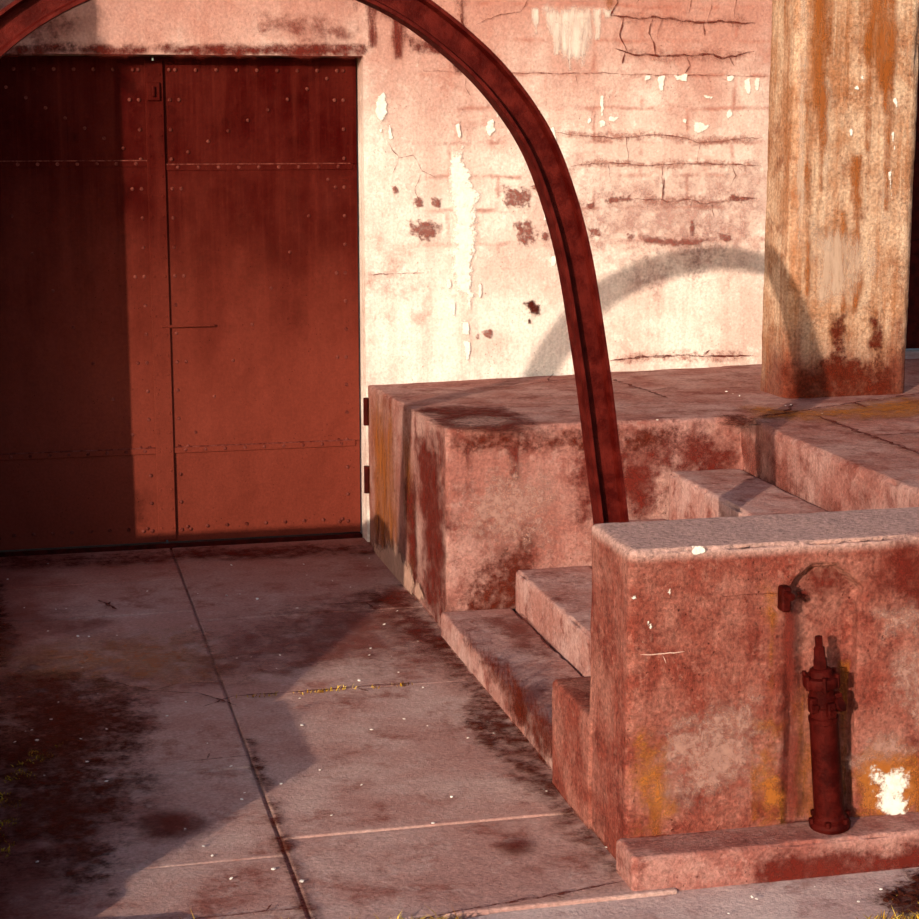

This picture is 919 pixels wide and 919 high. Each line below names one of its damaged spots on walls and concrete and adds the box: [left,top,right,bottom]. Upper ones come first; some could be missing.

leakage [388,16,439,58]
crack [457,0,526,26]
crack [513,0,754,80]
rust [805,0,831,210]
rust [864,0,897,208]
spalling [409,219,440,241]
peeling [446,123,492,360]
spalling [505,185,537,207]
rust [840,107,869,319]
spalling [523,300,540,324]
leakage [830,315,846,379]
leakage [869,318,883,361]